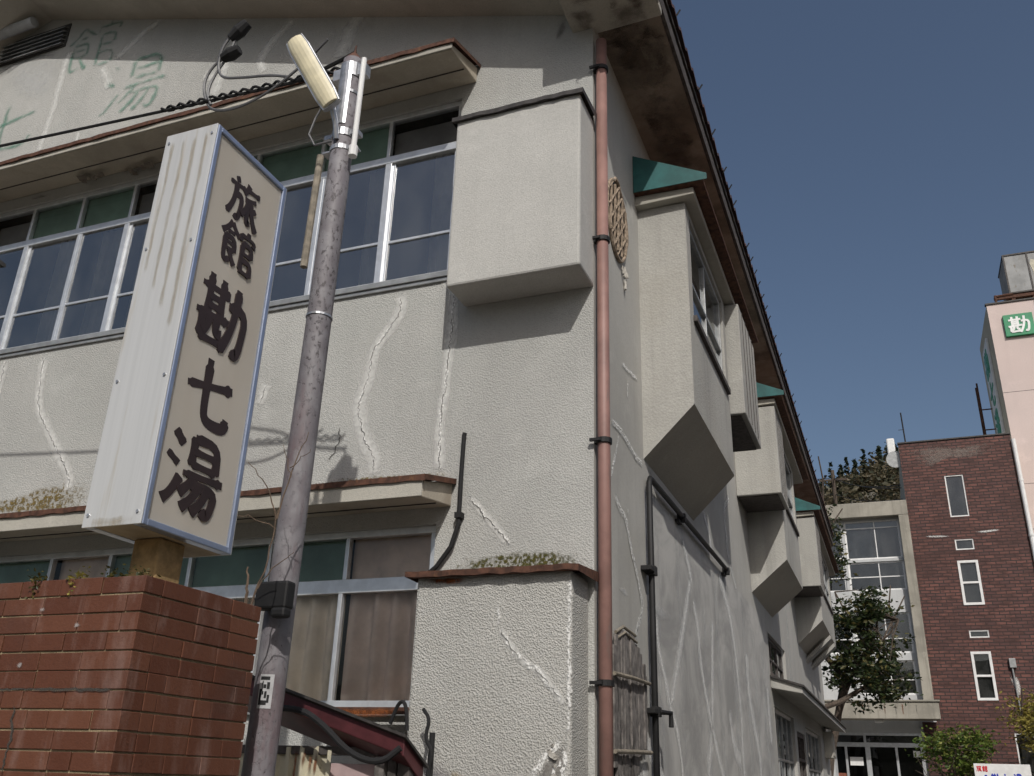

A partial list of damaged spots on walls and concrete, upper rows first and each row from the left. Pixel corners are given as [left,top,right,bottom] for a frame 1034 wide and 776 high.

crack [0,361,8,393]
crack [34,358,74,490]
crack [329,296,407,473]
crack [434,281,458,468]
crack [497,604,564,704]
crack [611,421,772,776]
spalling [532,742,568,776]